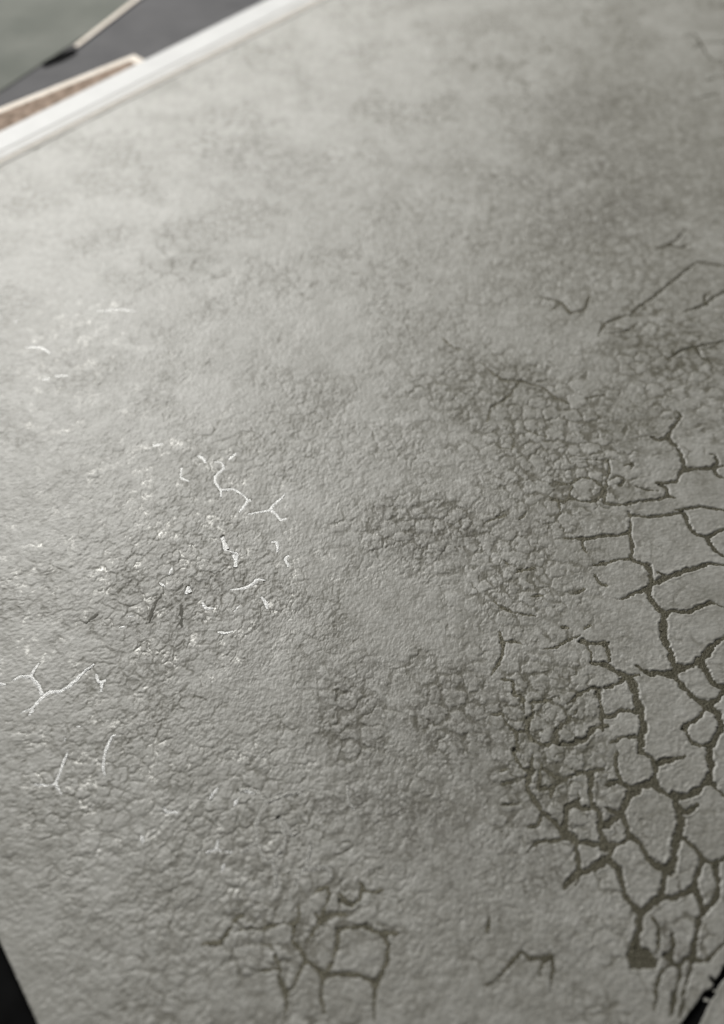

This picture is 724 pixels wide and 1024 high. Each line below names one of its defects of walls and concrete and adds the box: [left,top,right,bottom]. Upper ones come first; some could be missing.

crack [119,537,269,635]
crack [180,453,290,567]
crack [484,410,724,1018]
crack [201,785,399,1020]